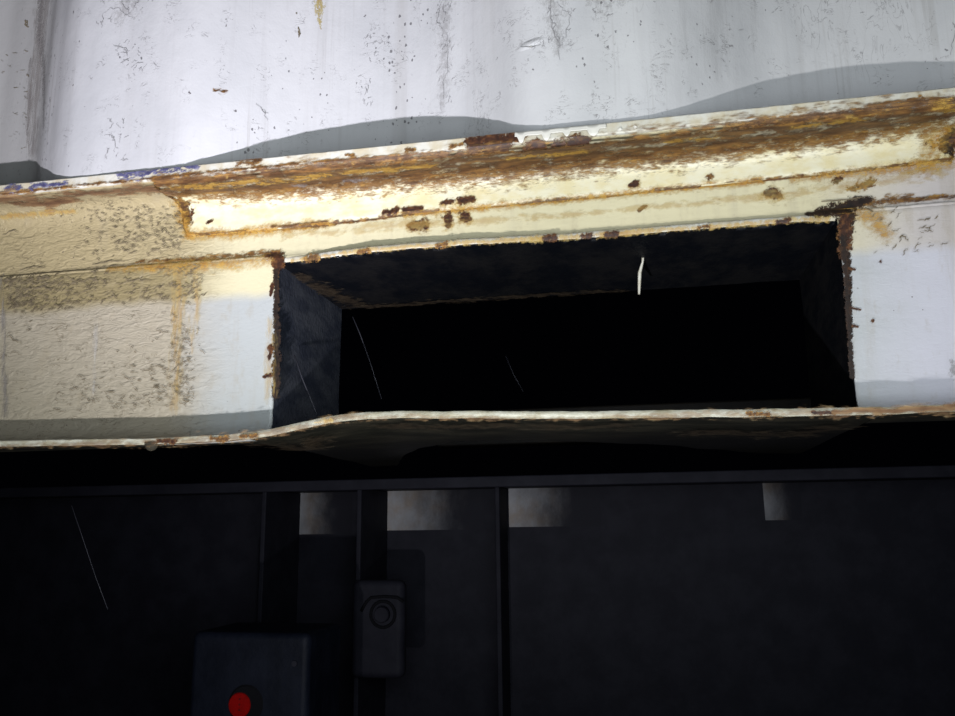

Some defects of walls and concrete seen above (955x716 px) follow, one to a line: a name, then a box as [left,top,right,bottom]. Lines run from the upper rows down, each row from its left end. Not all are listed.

rust [314,0,324,28]
rust [0,95,955,234]
rust [107,176,955,399]